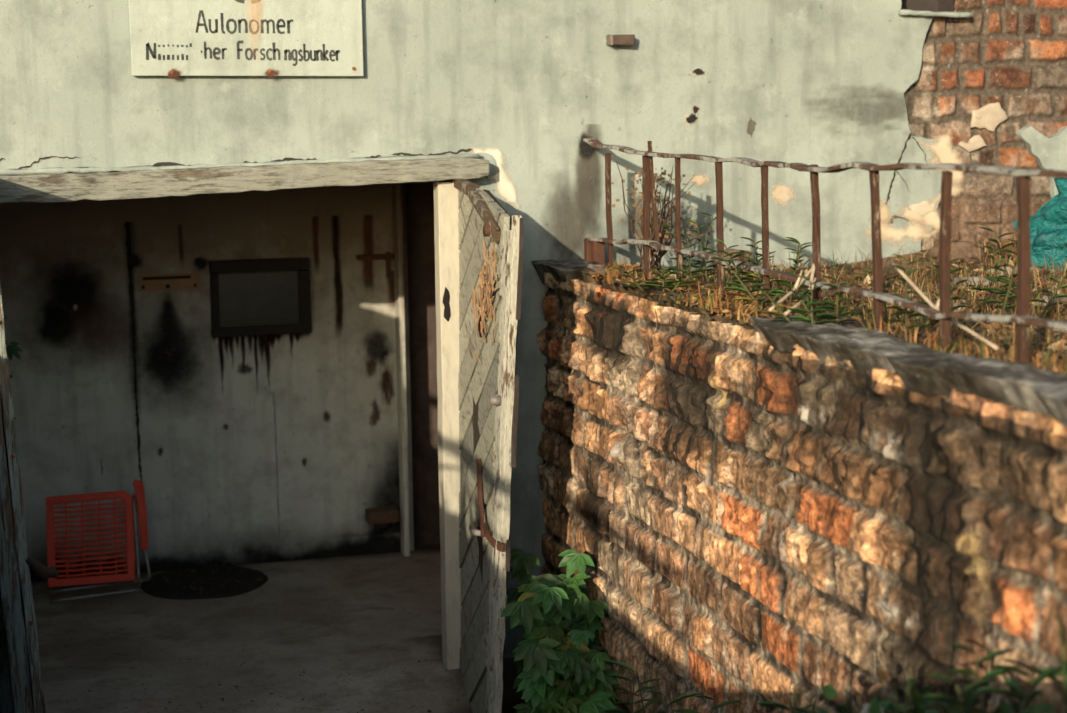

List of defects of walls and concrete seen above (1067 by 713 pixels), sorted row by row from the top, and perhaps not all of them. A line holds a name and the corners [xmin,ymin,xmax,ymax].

spalling [685,106,699,123]
spalling [866,0,1067,250]
spalling [473,148,519,207]
spalling [772,185,793,205]
crack [885,133,931,224]
rust [364,215,373,286]